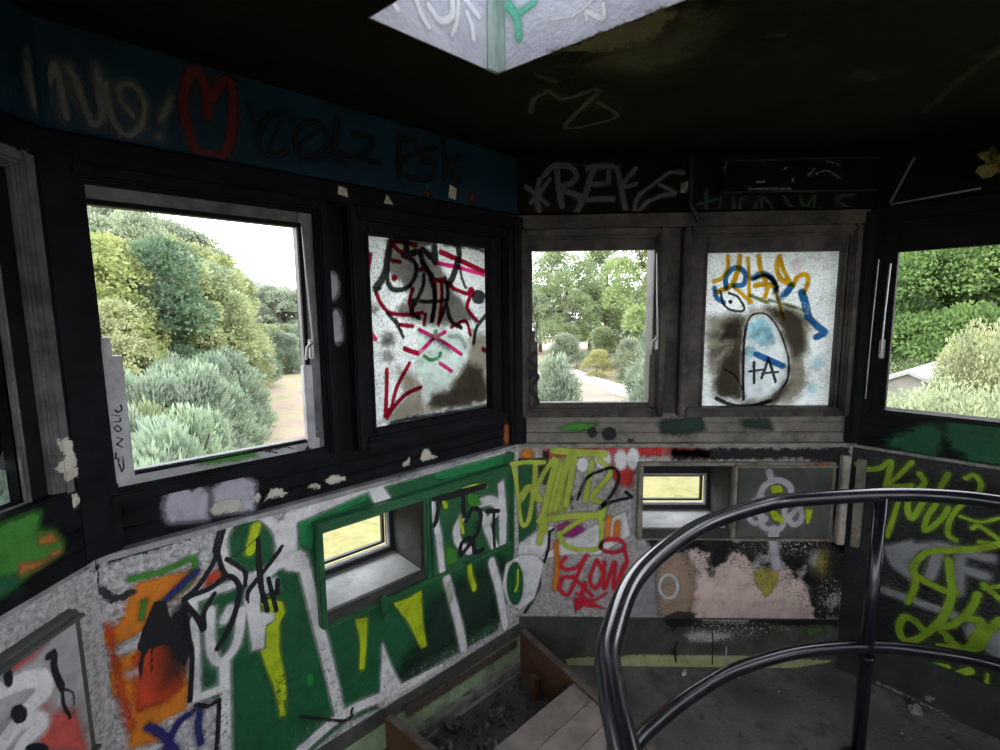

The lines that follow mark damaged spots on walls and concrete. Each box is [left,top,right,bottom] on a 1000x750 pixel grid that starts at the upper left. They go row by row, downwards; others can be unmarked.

peeling [54,437,78,481]
peeling [308,474,346,490]